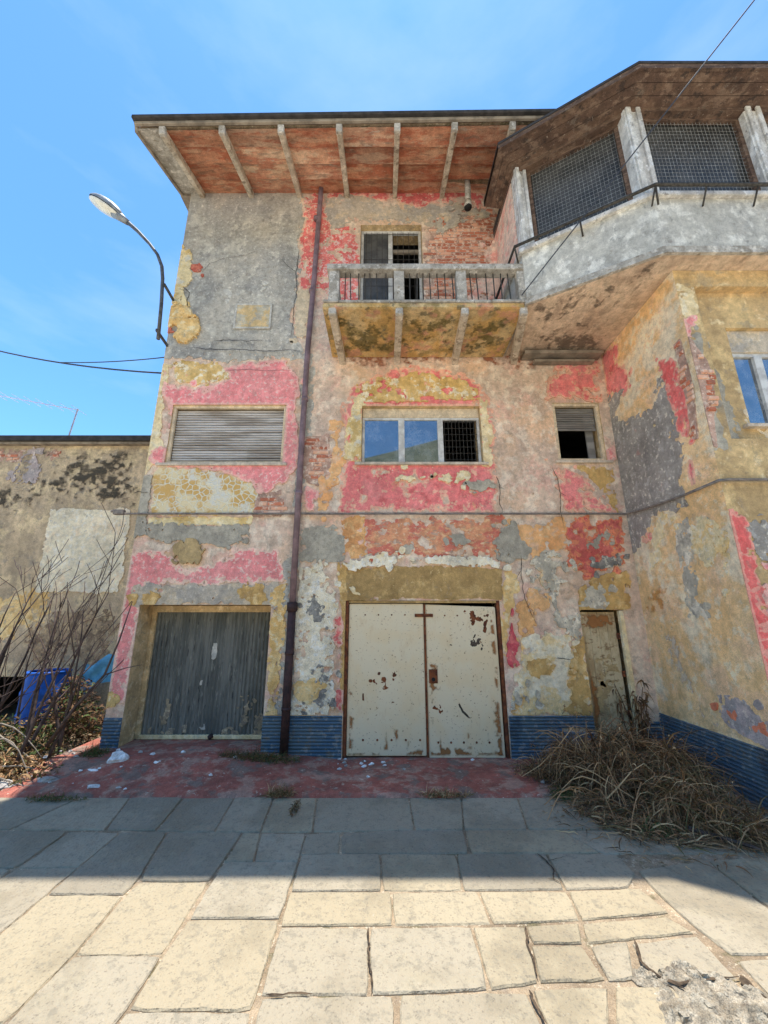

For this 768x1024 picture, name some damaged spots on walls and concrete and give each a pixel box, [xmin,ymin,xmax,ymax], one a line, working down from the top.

crack [201,252,299,371]
damp [338,318,389,366]
damp [402,319,450,342]
damp [467,321,532,368]
damp [0,453,135,507]
flaking render [24,193,768,735]
corrosion [464,610,496,654]
spalling [631,959,768,1024]